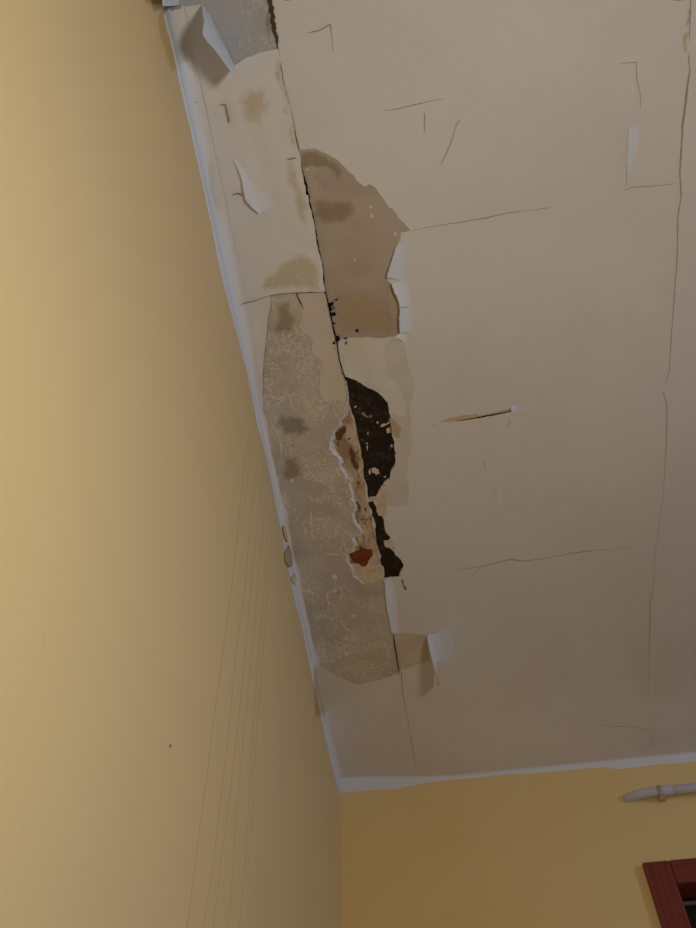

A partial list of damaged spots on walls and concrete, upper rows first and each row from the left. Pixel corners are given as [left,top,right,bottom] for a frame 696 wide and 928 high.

peeling [162,0,278,78]
crack [268,0,347,381]
water stain [335,426,360,484]
peeling [242,148,454,686]
crack [440,405,534,423]